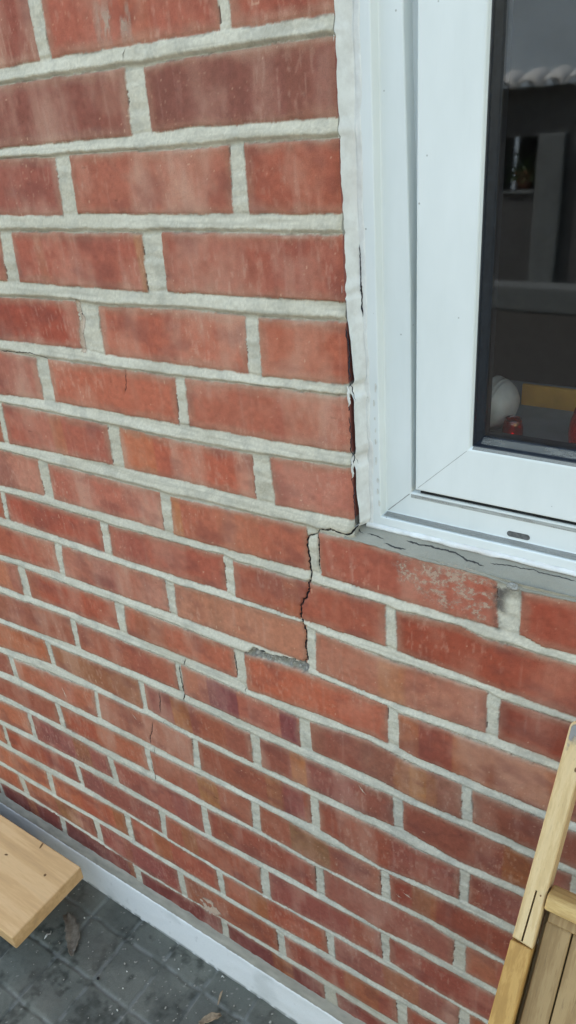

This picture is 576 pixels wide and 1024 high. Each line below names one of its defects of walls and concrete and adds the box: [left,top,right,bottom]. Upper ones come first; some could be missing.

spalling [246,647,310,670]
crack [300,523,574,660]